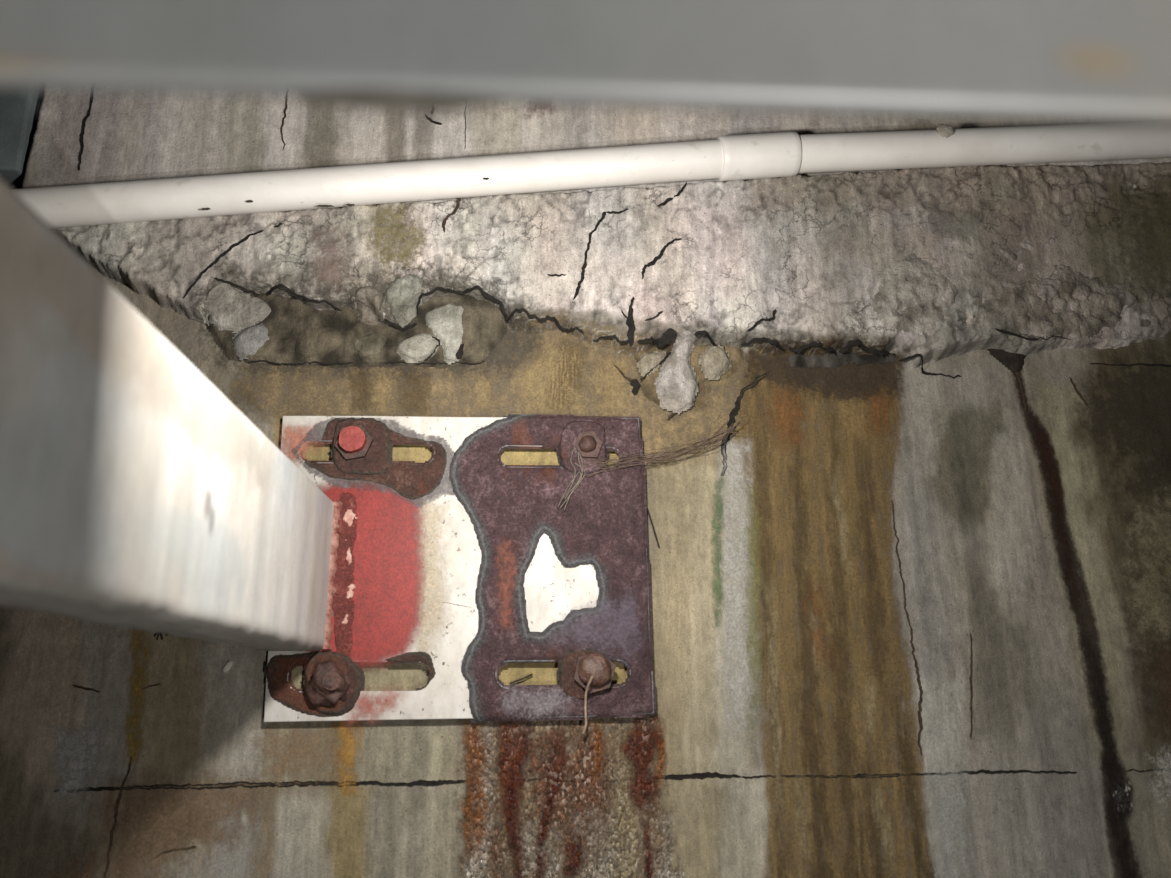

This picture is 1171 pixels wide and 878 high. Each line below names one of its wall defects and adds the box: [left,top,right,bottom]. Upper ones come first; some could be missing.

crack [183,223,283,299]
spalling [200,274,509,369]
crack [442,198,461,232]
crack [507,182,687,345]
spalling [614,328,744,420]
crack [721,309,961,476]
crack [1069,363,1171,408]
water stain [1085,361,1171,722]
corrosion [264,651,357,793]
corrosion [292,414,681,878]
crack [54,502,1077,878]
water stain [1013,371,1142,878]